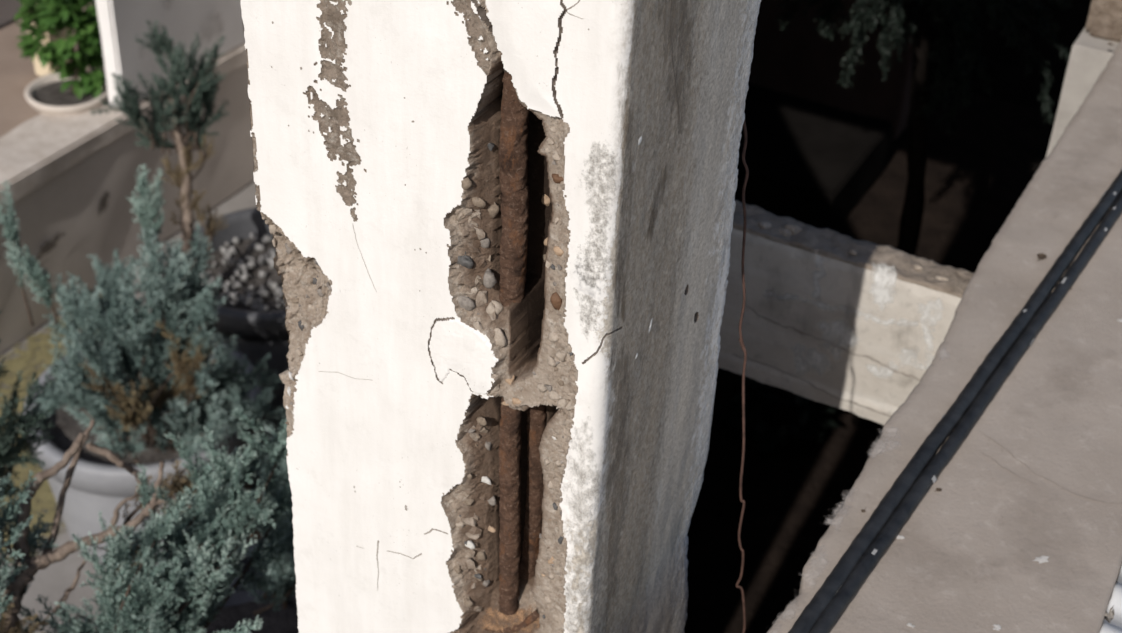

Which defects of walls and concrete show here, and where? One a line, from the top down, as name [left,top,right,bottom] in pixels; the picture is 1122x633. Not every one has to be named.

peeling [300,0,367,222]
crack [552,0,583,118]
spalling [249,100,332,456]
crack [428,317,473,392]
spalling [428,0,601,633]
peeling [582,146,614,333]
corrosion [484,609,539,631]